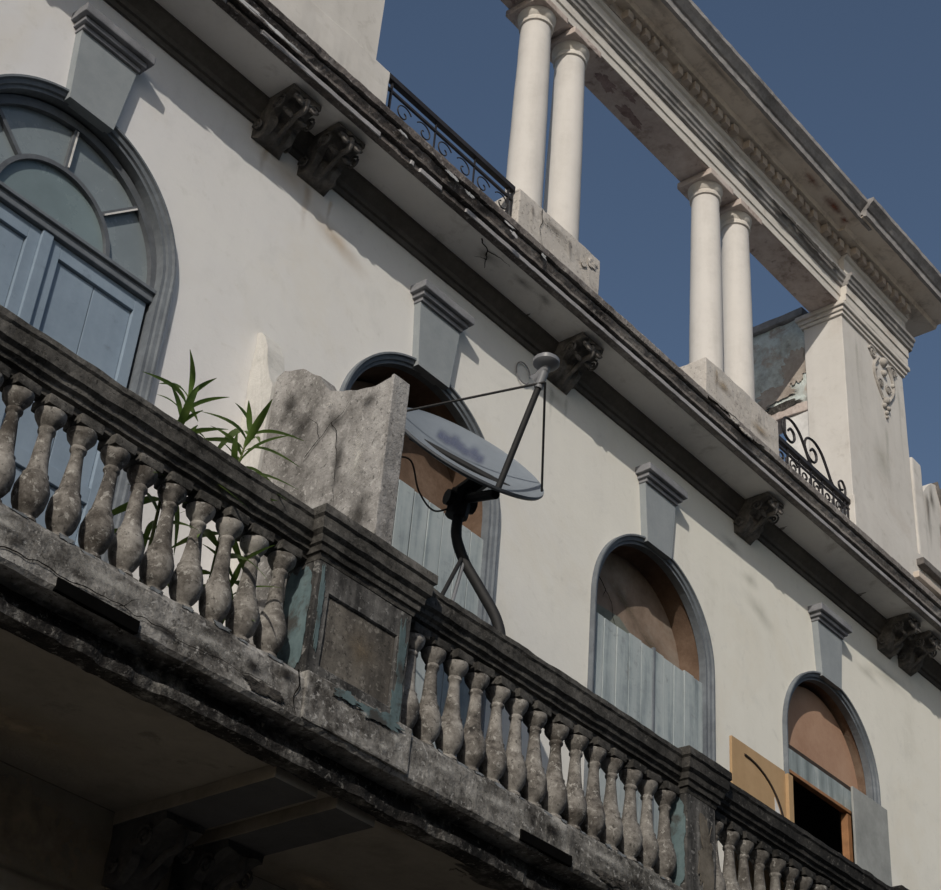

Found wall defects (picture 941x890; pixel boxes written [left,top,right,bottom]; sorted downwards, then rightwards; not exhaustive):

peeling [595,73,642,131]
crack [476,238,507,268]
peeling [756,347,806,415]
crack [0,546,157,626]
peeling [268,564,326,669]
peeling [333,618,408,734]